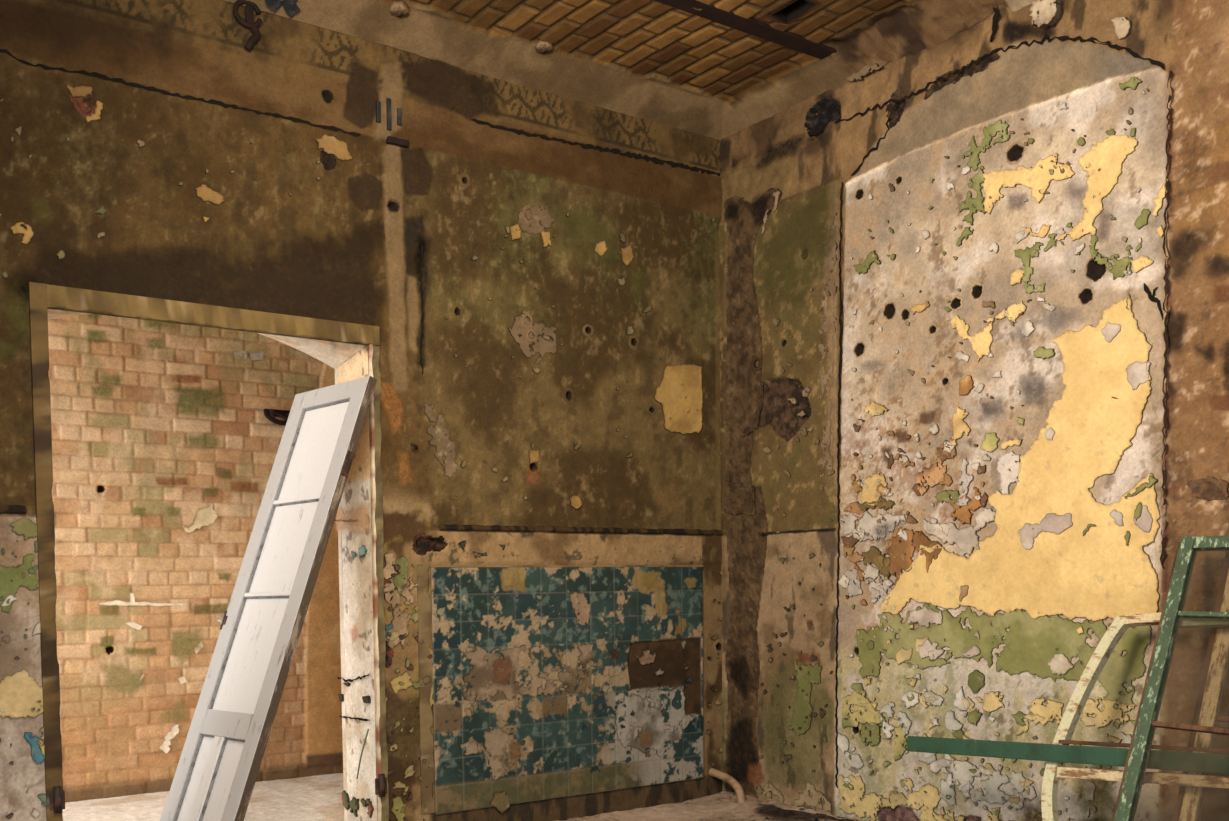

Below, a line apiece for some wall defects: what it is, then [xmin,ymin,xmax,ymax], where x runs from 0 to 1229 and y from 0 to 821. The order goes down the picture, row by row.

crack [0,49,361,137]
flaking render [804,98,841,140]
flaking render [924,53,1000,100]
leakage [727,194,769,223]
peeling [507,311,563,378]
flaking render [648,358,703,435]
crack [775,7,1172,788]
peeling [707,107,1168,821]
peeling [0,517,38,613]
peeling [0,622,45,765]
leakage [730,657,747,699]
leakage [726,720,757,781]